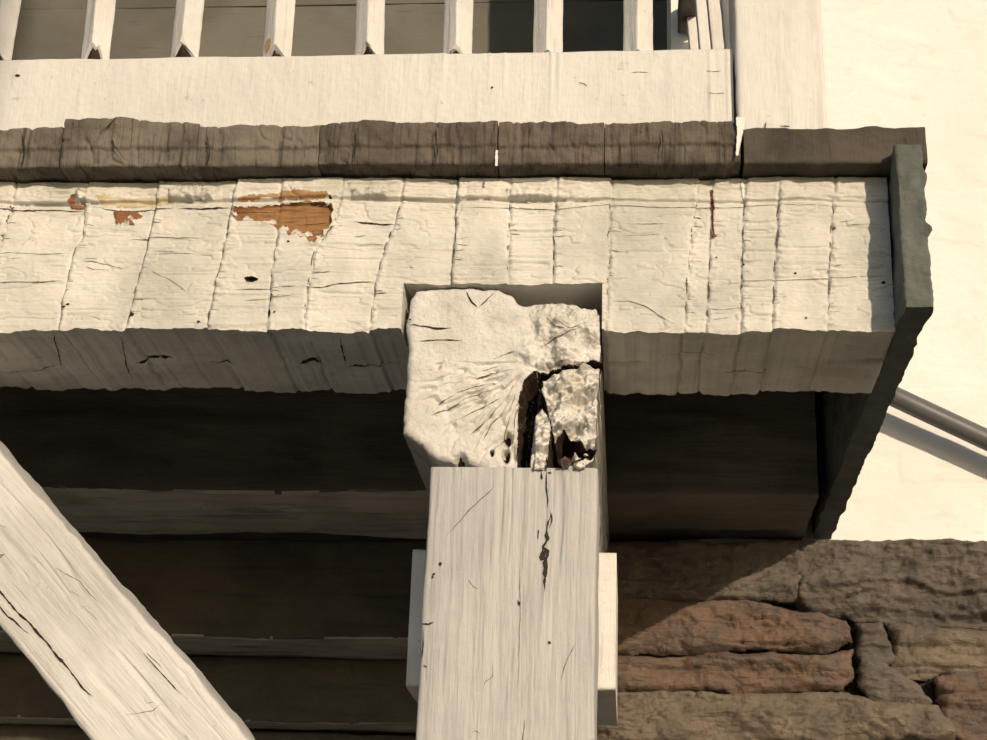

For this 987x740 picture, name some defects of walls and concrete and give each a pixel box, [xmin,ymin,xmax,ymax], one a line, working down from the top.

peeling [113,210,142,228]
peeling [229,195,334,247]
crack [0,204,403,380]
crack [546,318,582,345]
crack [431,351,516,449]
spalling [549,430,596,468]
crack [517,472,553,672]
crack [0,591,92,696]